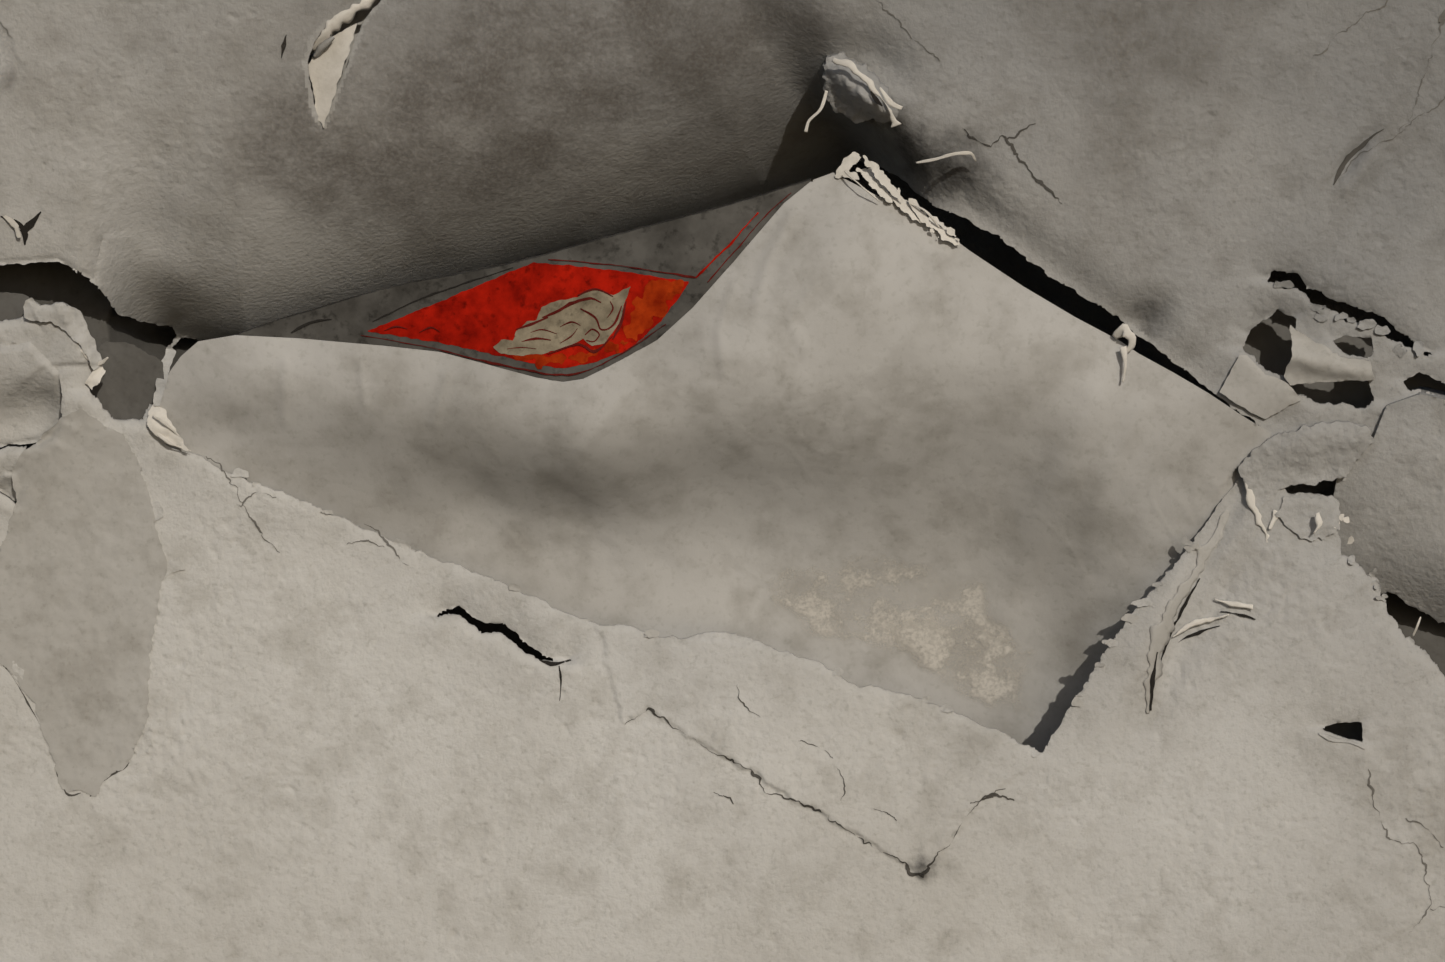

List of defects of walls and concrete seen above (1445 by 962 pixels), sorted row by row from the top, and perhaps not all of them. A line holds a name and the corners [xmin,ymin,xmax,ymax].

spalling [1220,309,1375,419]
spalling [1404,372,1445,392]
peeling [0,131,203,797]
crack [437,606,571,701]
spalling [1380,592,1445,676]
crack [625,707,1014,878]